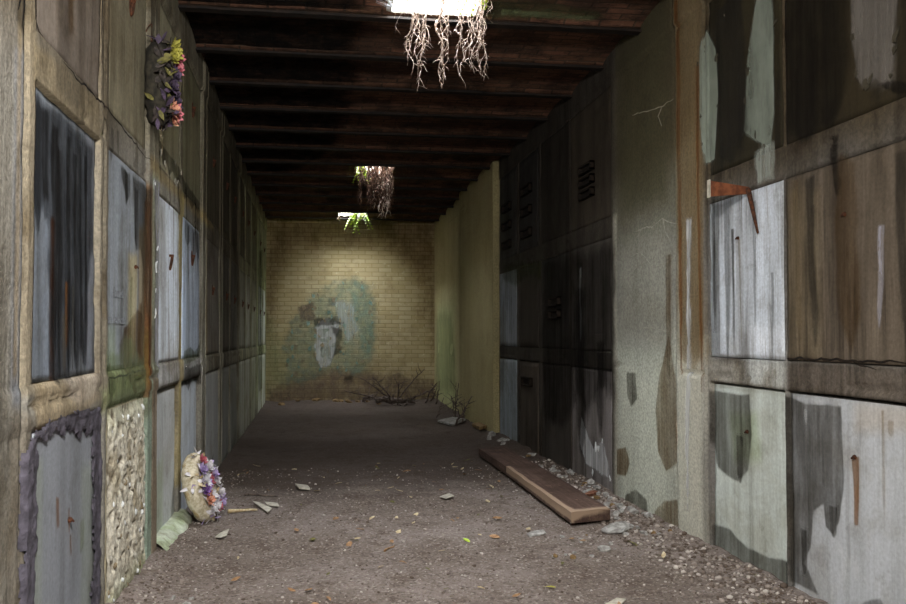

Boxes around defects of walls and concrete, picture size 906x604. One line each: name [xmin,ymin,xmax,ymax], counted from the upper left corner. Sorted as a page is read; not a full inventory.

crack [18,0,43,50]
water stain [34,96,93,383]
peeling [284,281,373,381]
spalling [106,398,146,603]
water stain [786,398,824,543]